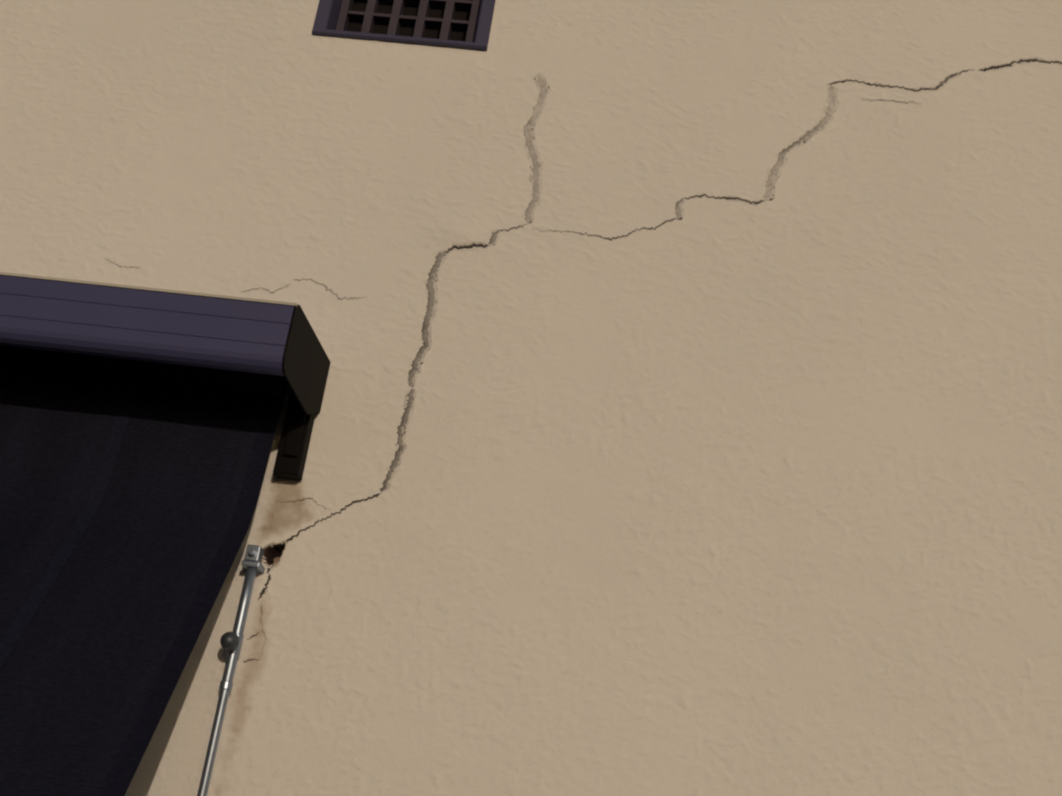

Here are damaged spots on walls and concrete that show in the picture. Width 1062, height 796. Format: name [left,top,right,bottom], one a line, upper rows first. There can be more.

crack [241,57,1062,663]